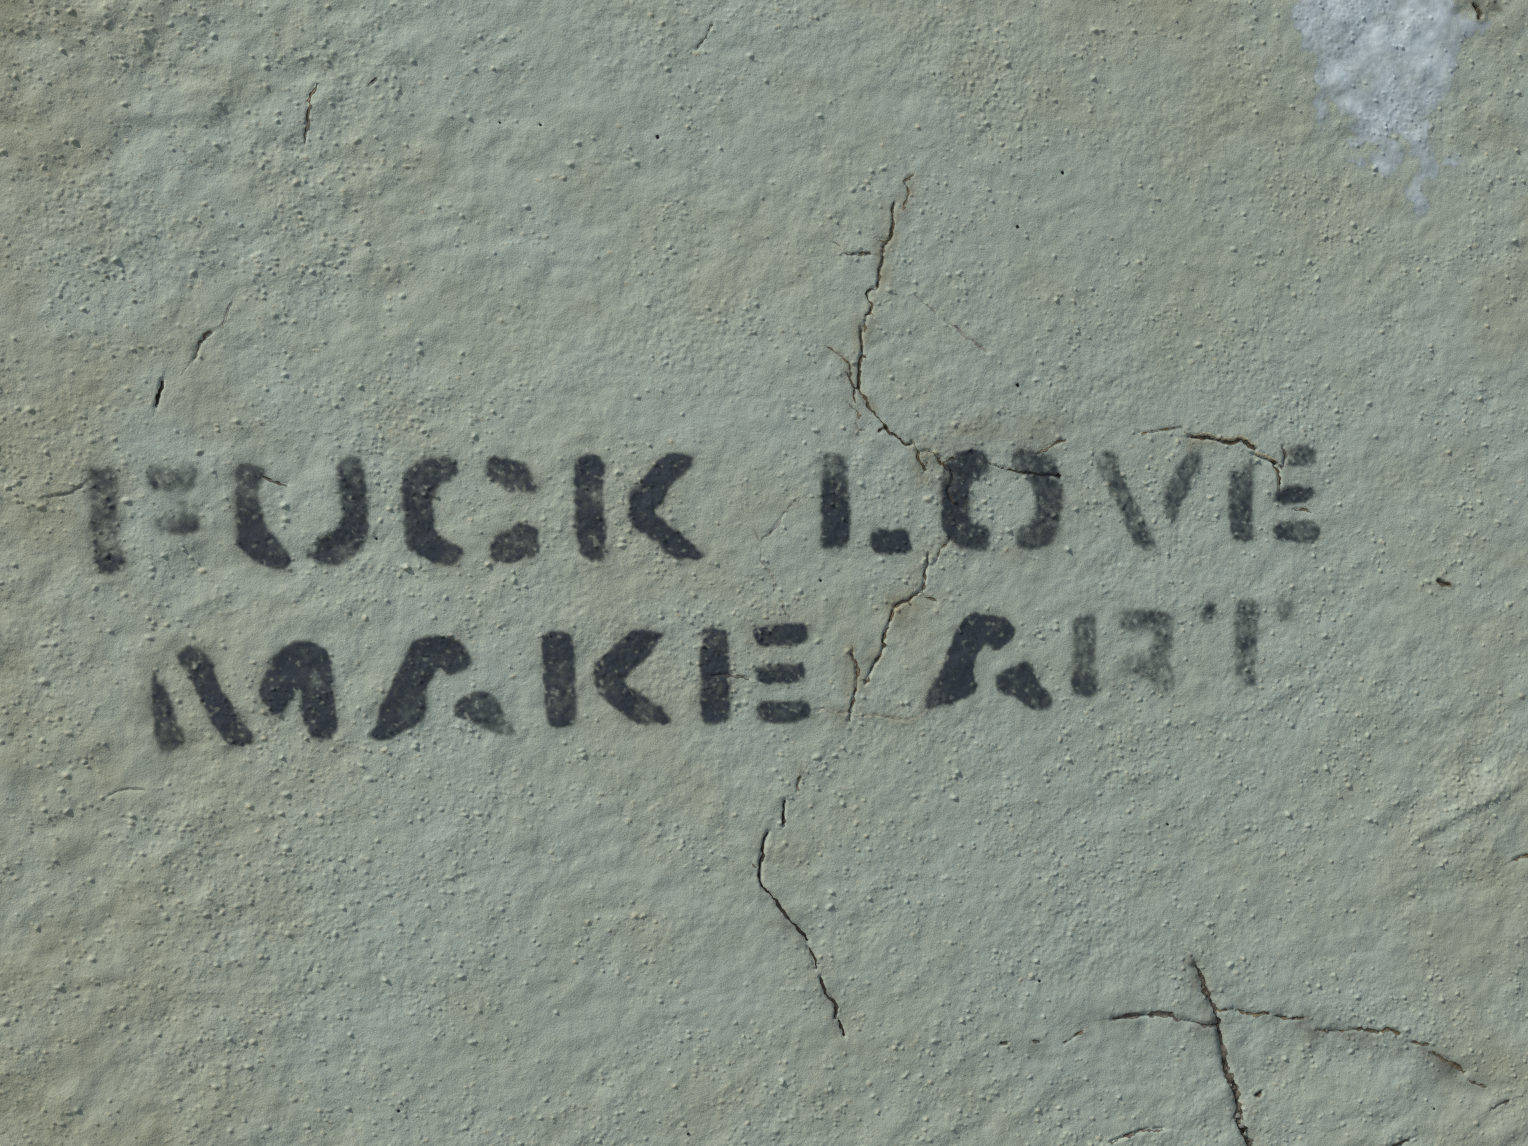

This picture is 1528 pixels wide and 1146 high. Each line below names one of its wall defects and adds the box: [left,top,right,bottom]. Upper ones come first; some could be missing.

crack [811,174,1066,721]
crack [1139,426,1308,511]
crack [752,775,845,1036]
crack [1000,965,1509,1146]